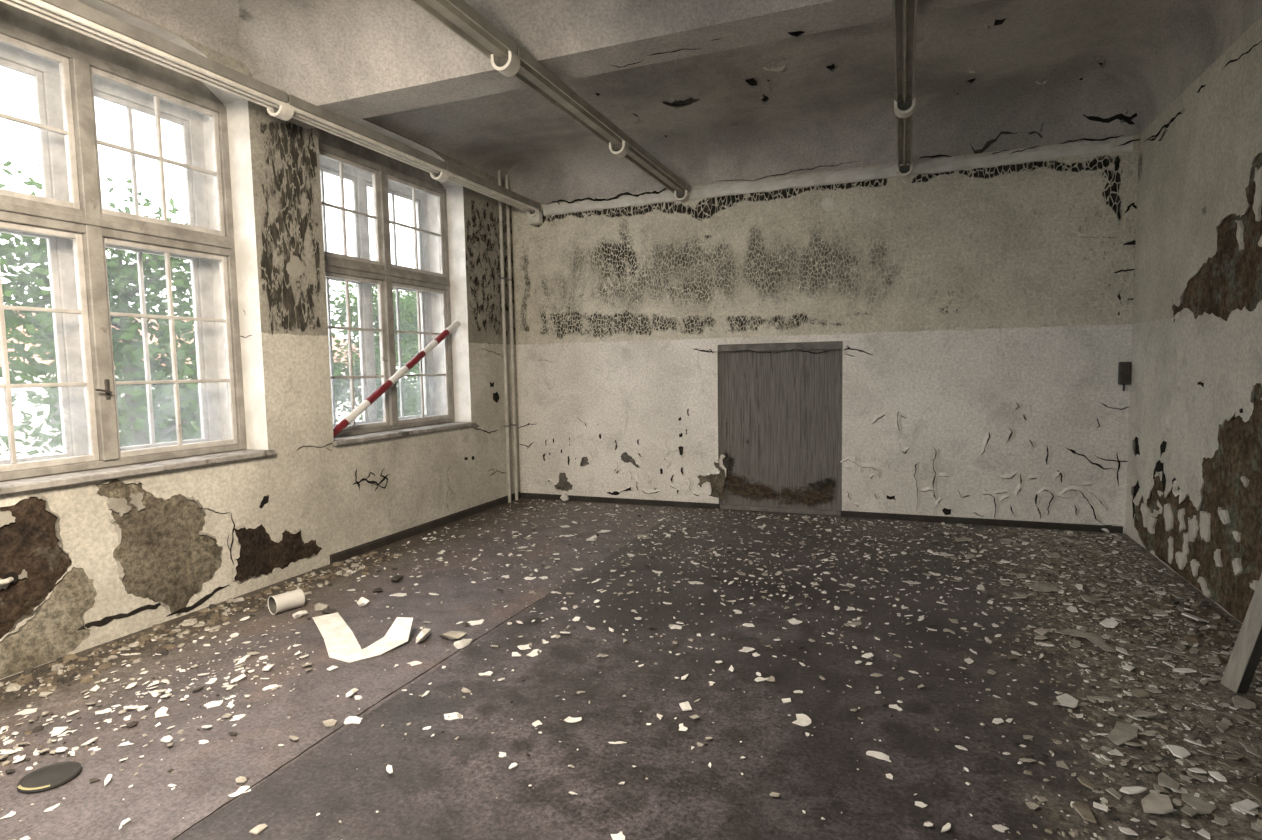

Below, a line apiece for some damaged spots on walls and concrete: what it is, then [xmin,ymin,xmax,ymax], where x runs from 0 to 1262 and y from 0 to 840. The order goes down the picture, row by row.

crack [919,40,1262,159]
peeling [260,122,320,335]
peeling [465,200,515,336]
leakage [602,244,639,281]
leakage [521,258,841,339]
peeling [535,178,888,227]
flaking render [1172,151,1262,323]
flaking render [0,493,97,679]
crack [78,508,235,631]
flaking render [94,478,322,616]
peeling [599,408,726,499]
flaking render [1131,383,1262,624]